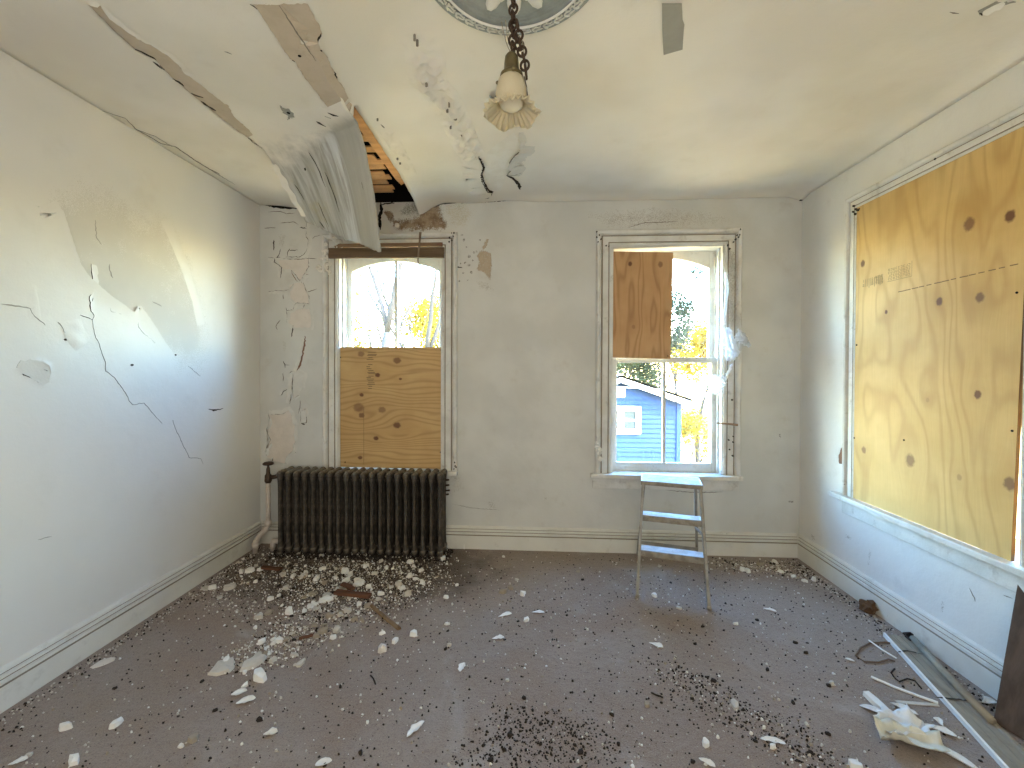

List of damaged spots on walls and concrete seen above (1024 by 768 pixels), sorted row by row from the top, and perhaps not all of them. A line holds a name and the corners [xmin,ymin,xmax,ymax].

peeling [247,0,307,58]
peeling [83,0,261,148]
peeling [272,164,305,217]
peeling [484,132,535,191]
peeling [36,178,212,380]
flaking render [12,354,59,390]
crack [3,220,203,463]
peeling [263,406,298,468]